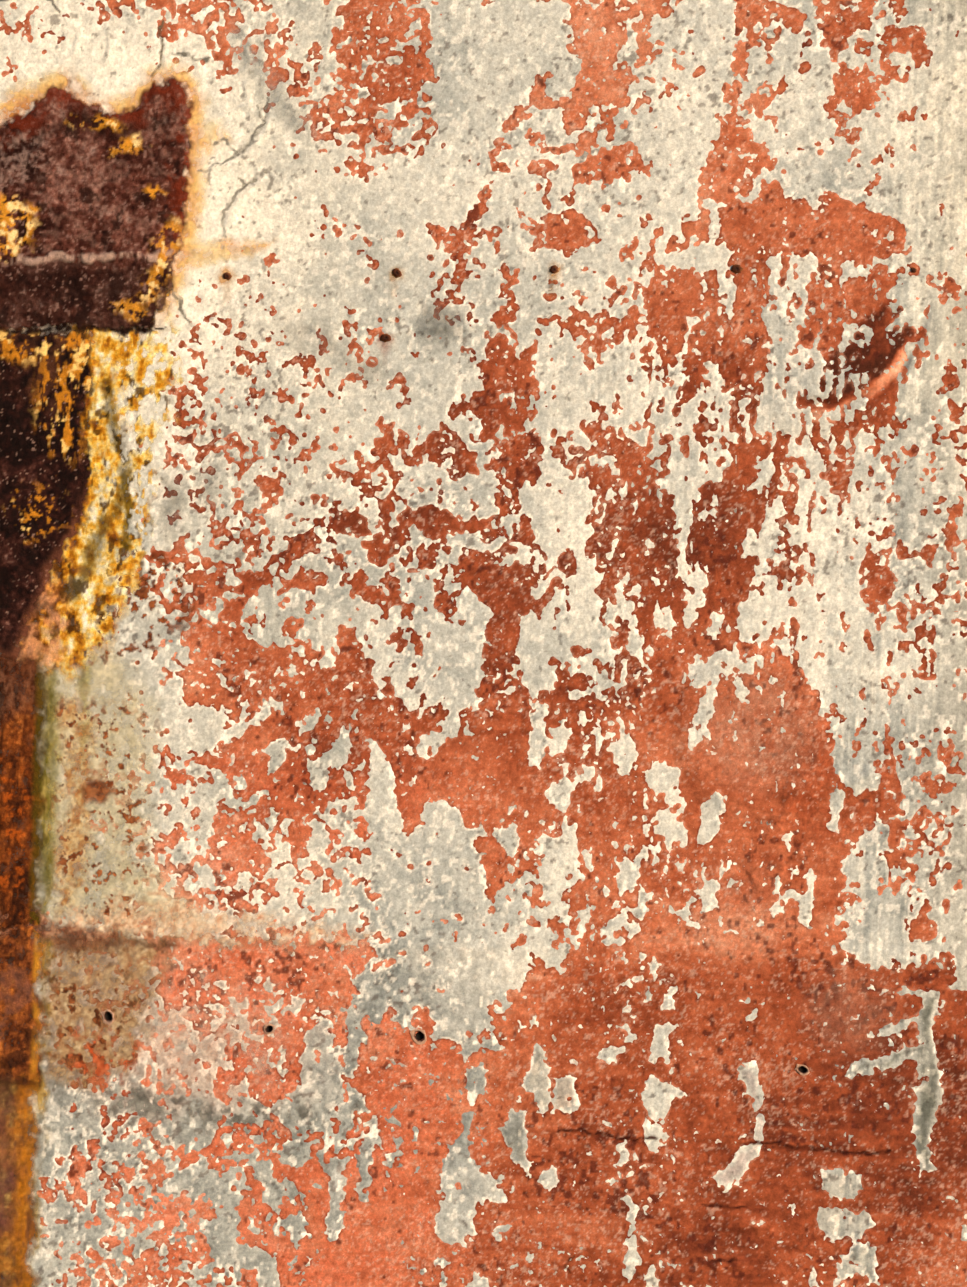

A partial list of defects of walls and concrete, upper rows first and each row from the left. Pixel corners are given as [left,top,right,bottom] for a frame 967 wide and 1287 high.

peeling [0,2,65,54]
peeling [62,0,446,183]
peeling [425,0,706,326]
peeling [294,196,404,284]
peeling [272,306,384,420]
peeling [262,414,321,474]
peeling [919,359,967,494]
peeling [850,474,967,710]
corrosion [0,71,266,1287]
peeling [719,617,847,738]
crack [558,1128,656,1141]
crack [750,1141,891,1156]